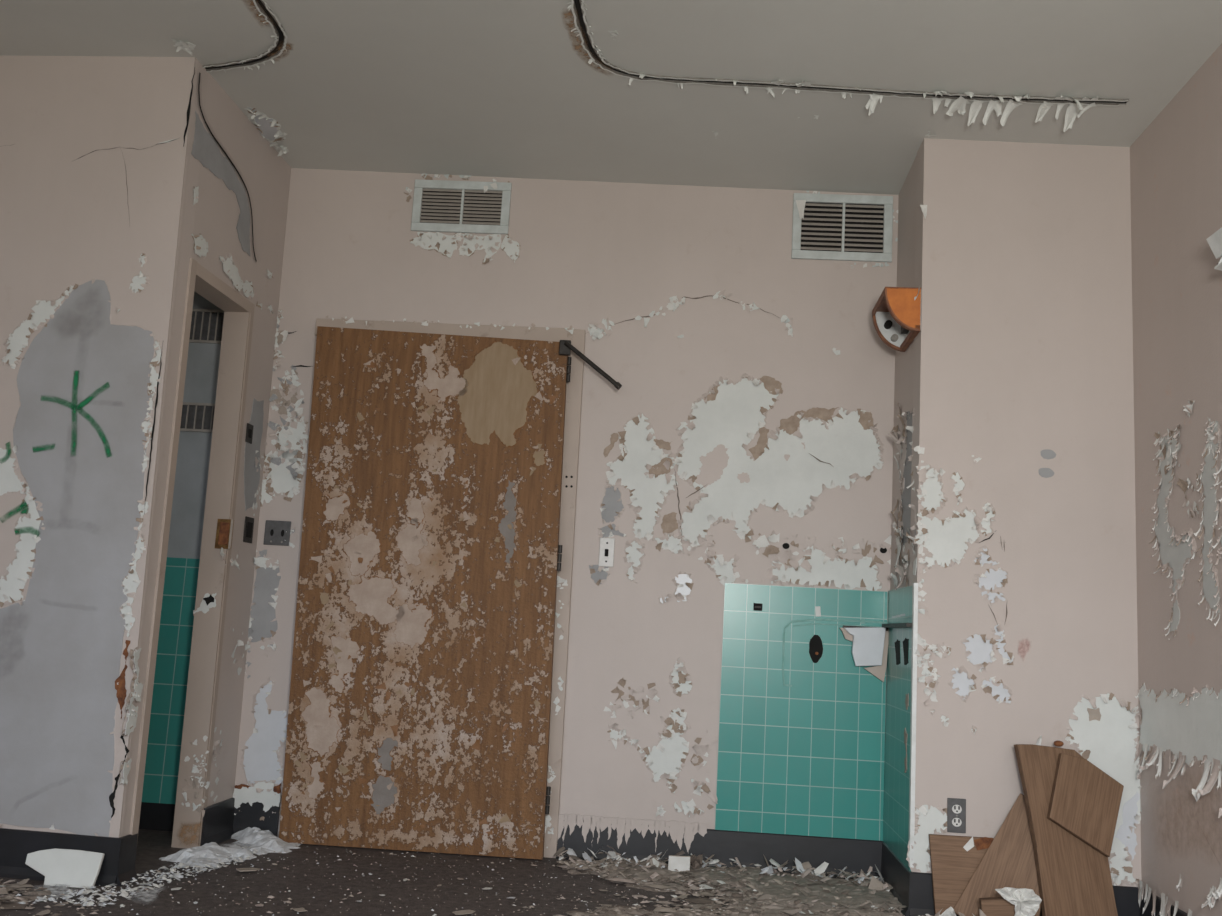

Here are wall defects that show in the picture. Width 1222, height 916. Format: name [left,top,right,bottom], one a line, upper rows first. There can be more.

peeling [0,278,162,837]